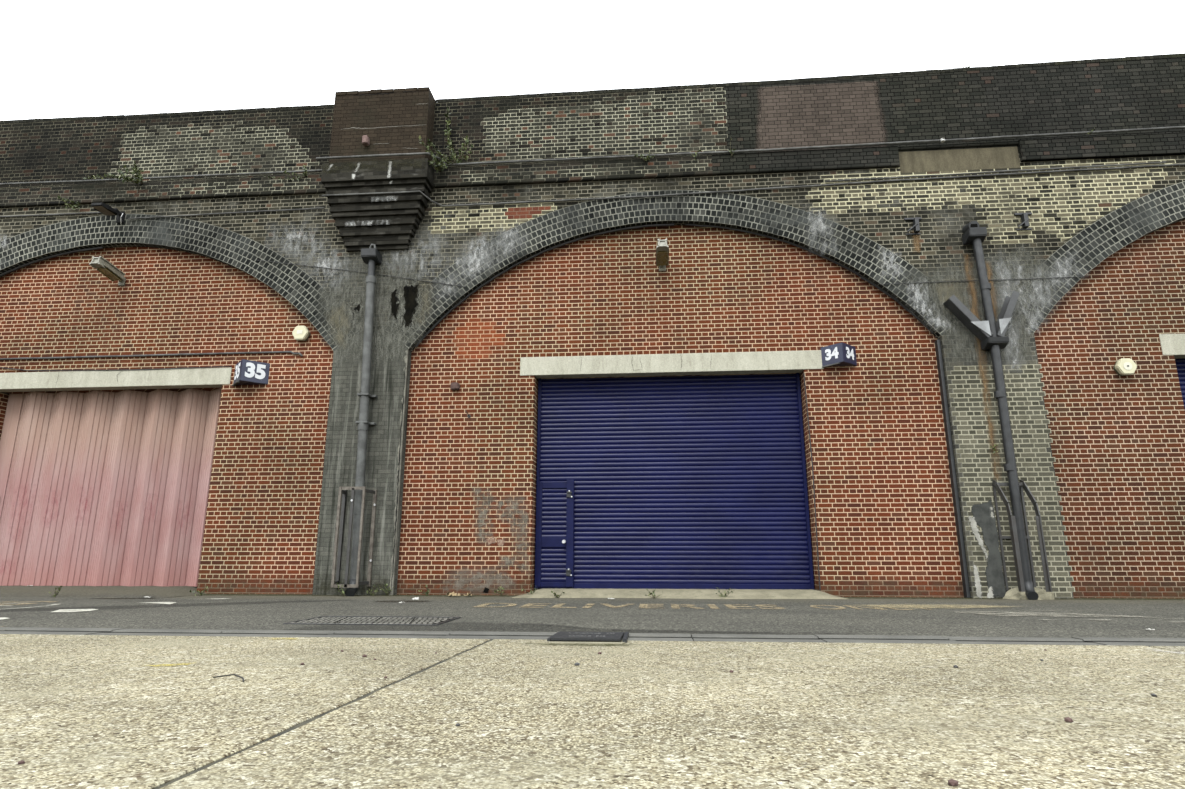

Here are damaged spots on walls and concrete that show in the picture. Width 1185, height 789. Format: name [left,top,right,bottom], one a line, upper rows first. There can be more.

water stain [273,229,442,364]
water stain [443,230,525,290]